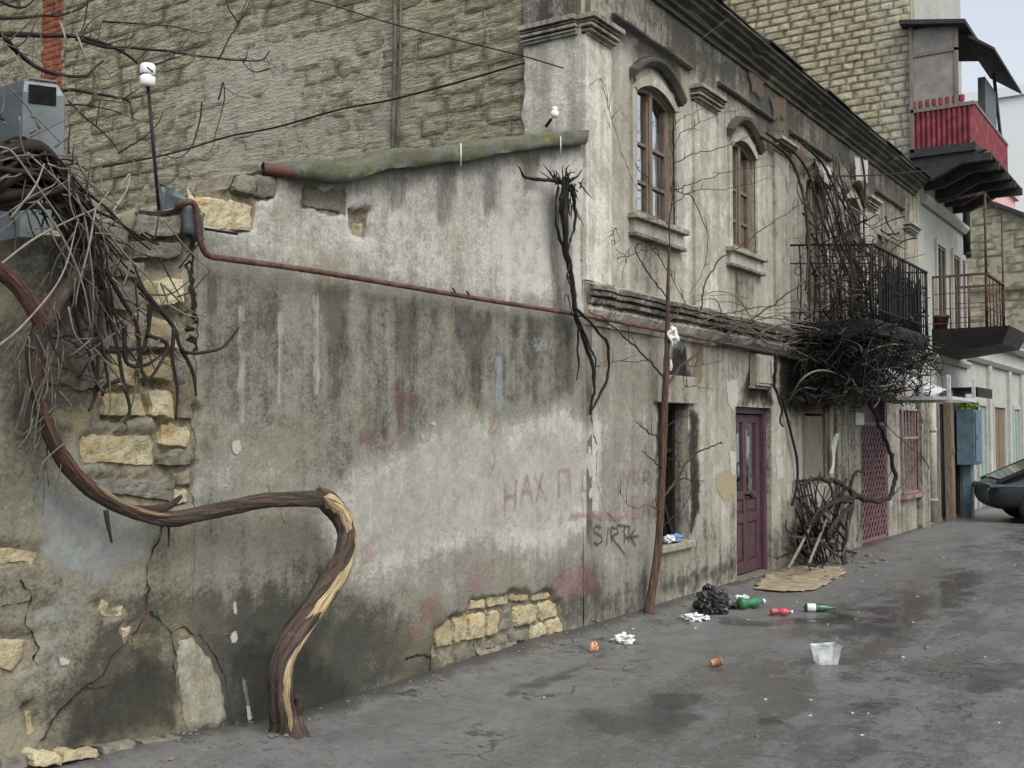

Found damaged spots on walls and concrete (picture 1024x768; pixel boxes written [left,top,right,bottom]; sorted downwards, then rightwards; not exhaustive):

spalling [187,172,276,232]
spalling [302,187,341,214]
water stain [237,335,245,423]
water stain [688,410,700,532]
spalling [0,548,36,565]
spalling [0,639,25,671]
crack [2,580,40,665]
crack [40,526,230,741]
spalling [433,591,563,662]